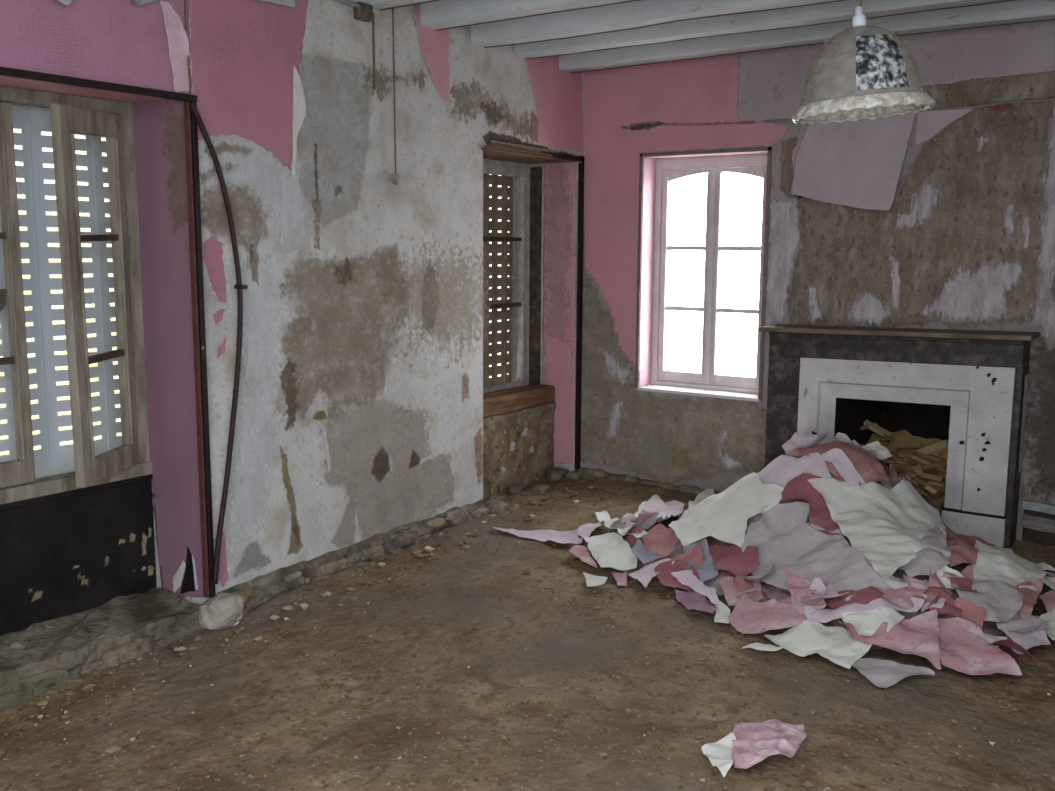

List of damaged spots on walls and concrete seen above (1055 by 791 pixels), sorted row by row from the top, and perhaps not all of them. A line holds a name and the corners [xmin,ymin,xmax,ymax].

flaking render [201,143,266,283]
spalling [483,131,576,156]
flaking render [780,71,1055,328]
damp [383,245,489,362]
flaking render [277,247,454,547]
flaking render [483,402,556,501]
flaking render [218,530,270,588]